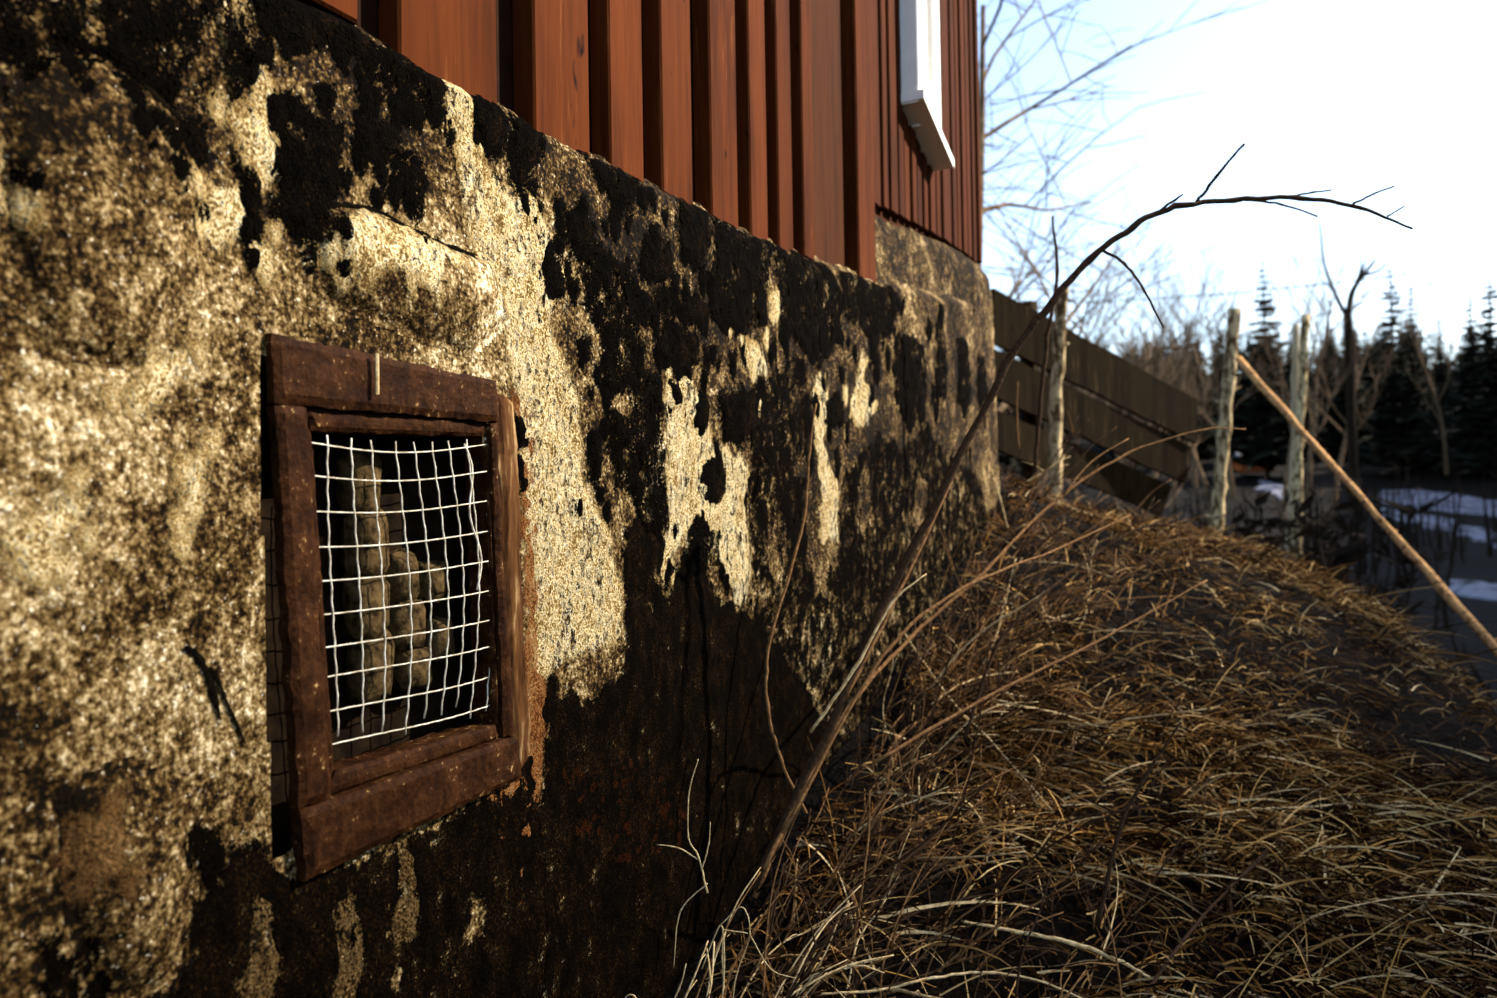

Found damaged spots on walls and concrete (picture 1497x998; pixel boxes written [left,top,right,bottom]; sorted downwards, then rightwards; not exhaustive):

damp [37,928,121,998]
damp [163,345,992,998]